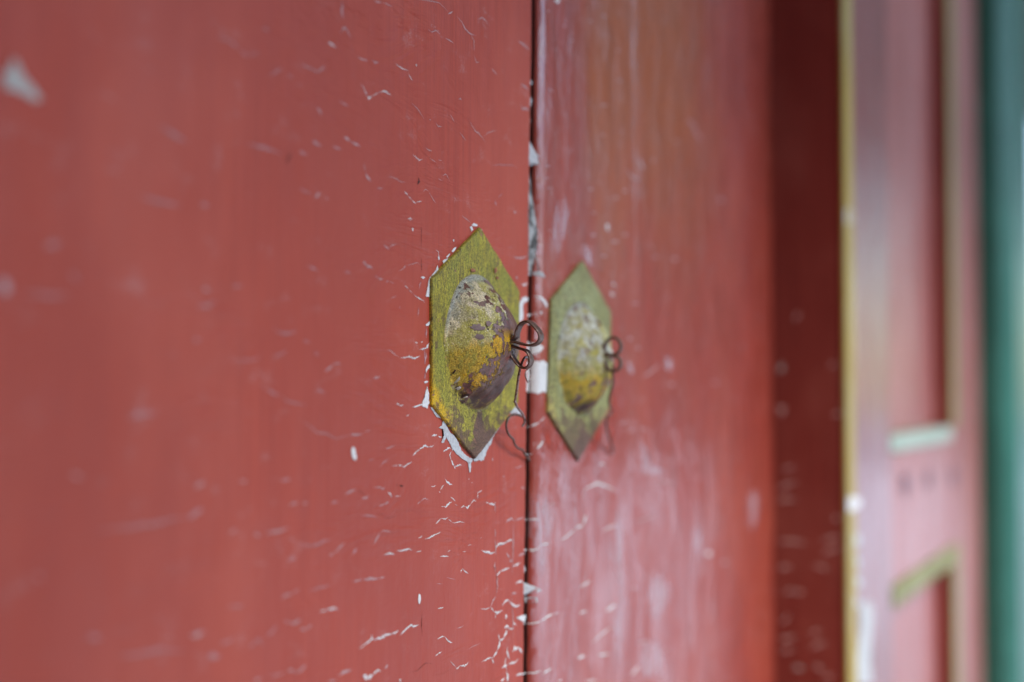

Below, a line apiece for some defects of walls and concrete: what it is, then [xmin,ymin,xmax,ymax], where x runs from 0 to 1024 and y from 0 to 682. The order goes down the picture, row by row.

peeling [421,239,456,297]
peeling [514,141,548,324]
peeling [414,364,499,473]
peeling [517,566,541,625]